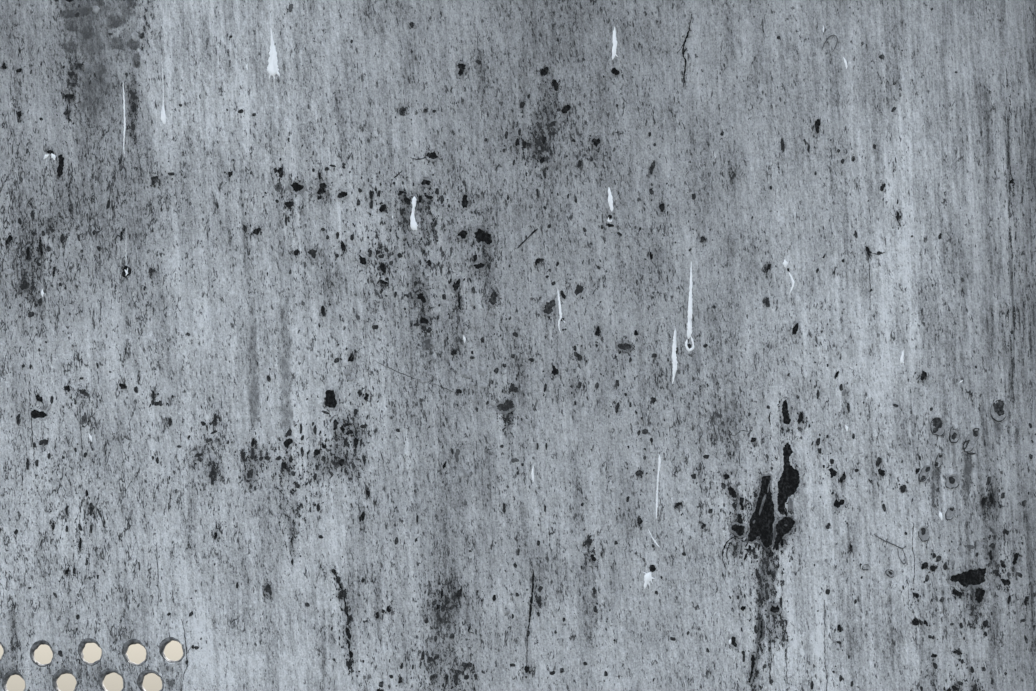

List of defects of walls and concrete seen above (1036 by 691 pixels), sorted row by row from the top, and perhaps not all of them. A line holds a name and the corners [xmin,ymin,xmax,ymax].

water stain [47,0,159,144]
crack [677,8,694,87]
water stain [726,540,795,691]